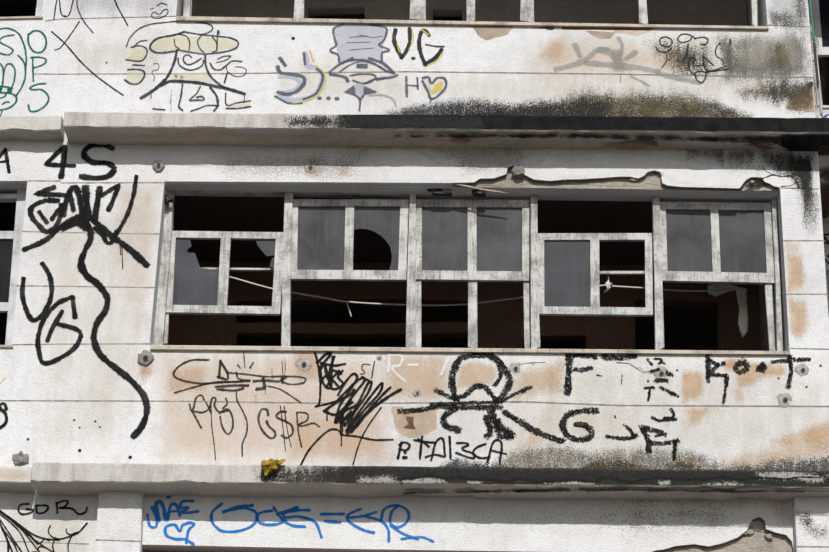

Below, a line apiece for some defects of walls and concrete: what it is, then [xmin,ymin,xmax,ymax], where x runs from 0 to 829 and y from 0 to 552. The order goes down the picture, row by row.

peeling [467,26,513,40]
peeling [535,27,650,39]
water stain [284,0,829,235]
spalling [452,164,680,190]
spalling [740,177,779,191]
peeling [819,171,829,219]
water stain [255,452,829,494]
spalling [652,517,793,552]